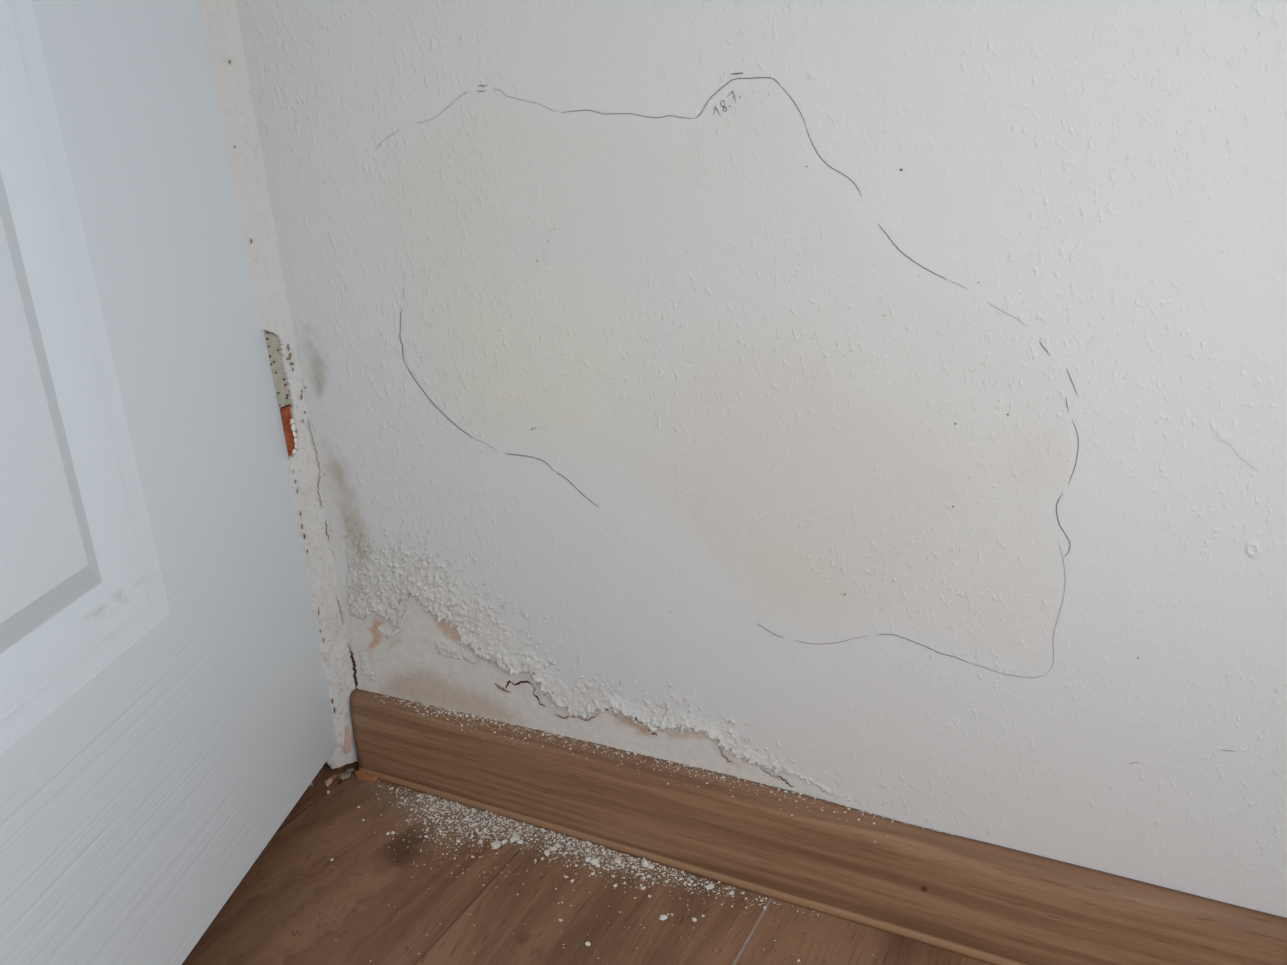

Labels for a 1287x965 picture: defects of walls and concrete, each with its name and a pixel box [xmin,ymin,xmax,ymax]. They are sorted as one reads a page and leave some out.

leakage [353,68,1093,681]
flaking render [348,595,811,792]